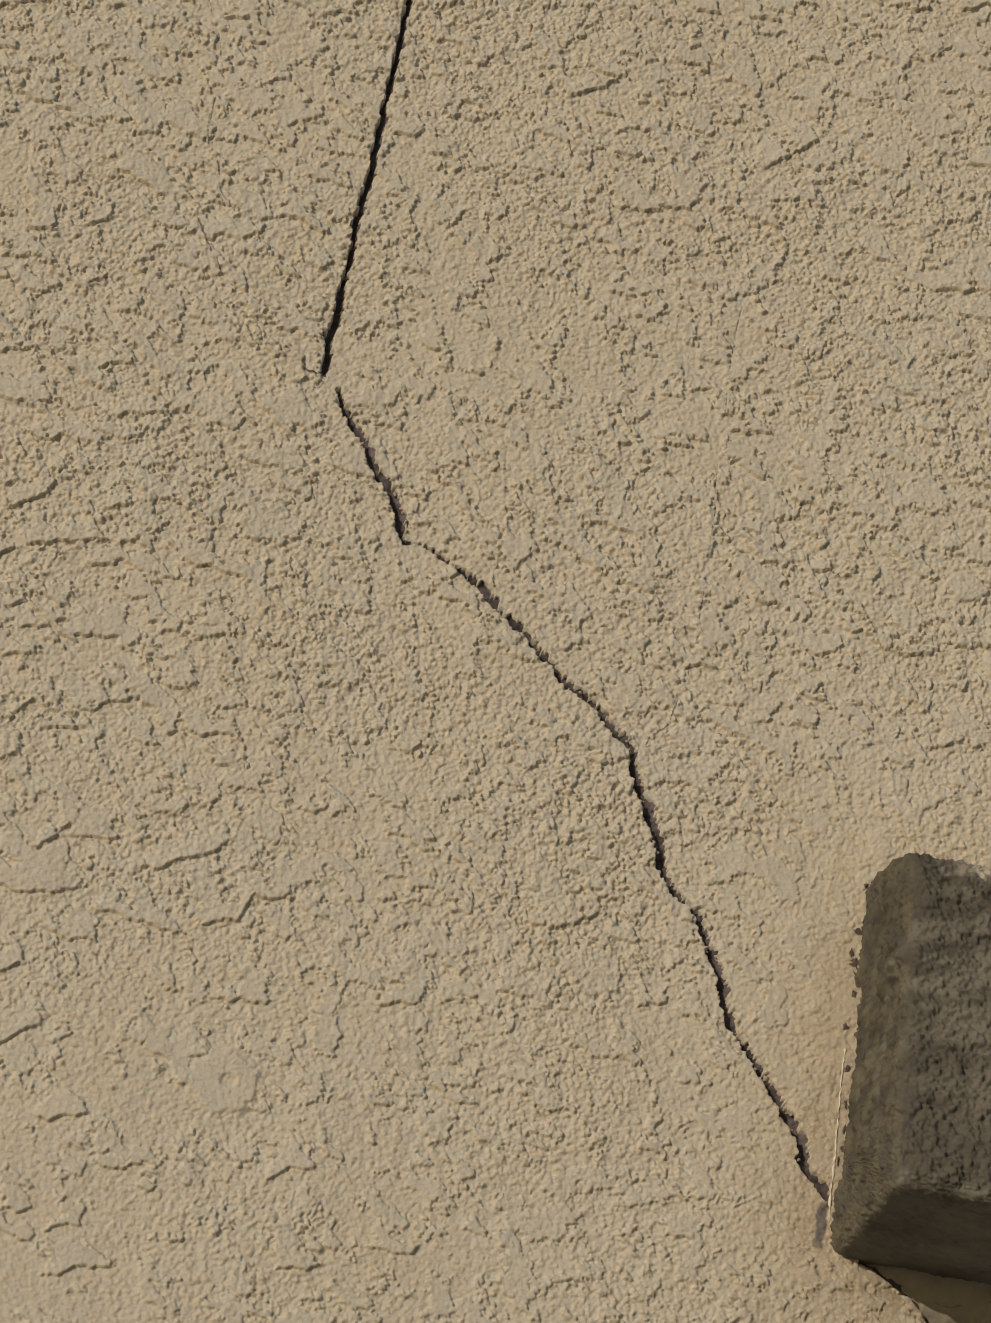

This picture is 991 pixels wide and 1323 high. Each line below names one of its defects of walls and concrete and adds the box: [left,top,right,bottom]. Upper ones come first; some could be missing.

crack [304,0,829,1203]
crack [858,1263,929,1323]